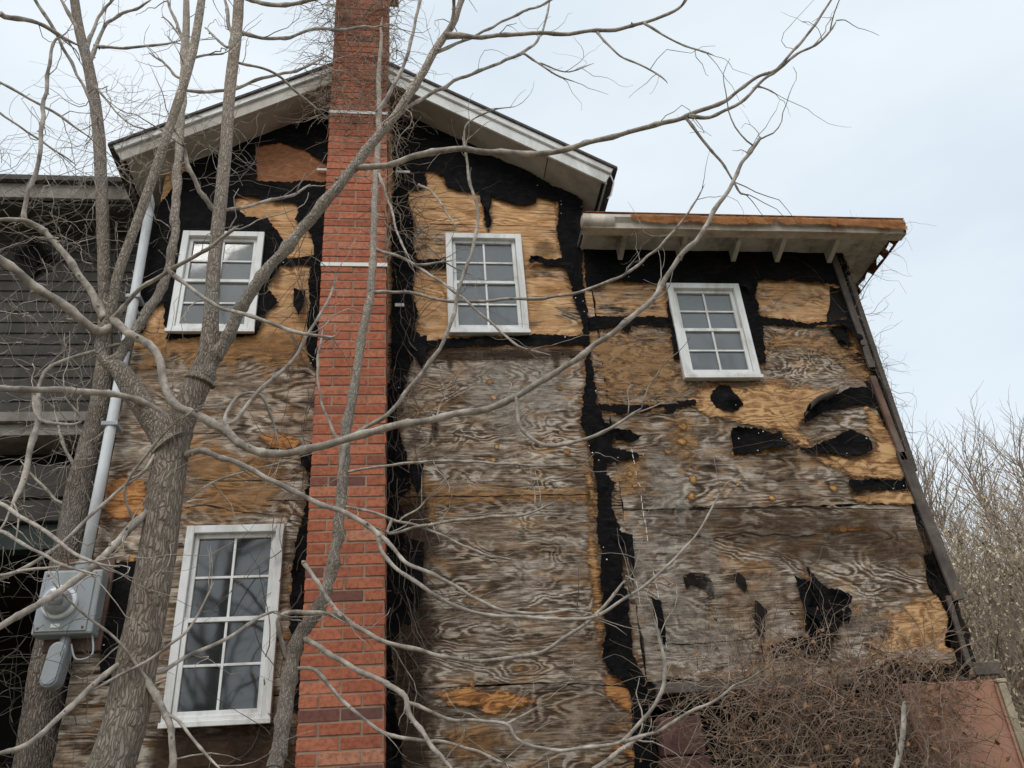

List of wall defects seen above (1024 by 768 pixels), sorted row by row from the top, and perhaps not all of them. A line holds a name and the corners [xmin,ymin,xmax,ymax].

damp [423,348,580,369]
damp [644,510,938,577]
damp [395,498,441,768]
damp [448,723,499,759]